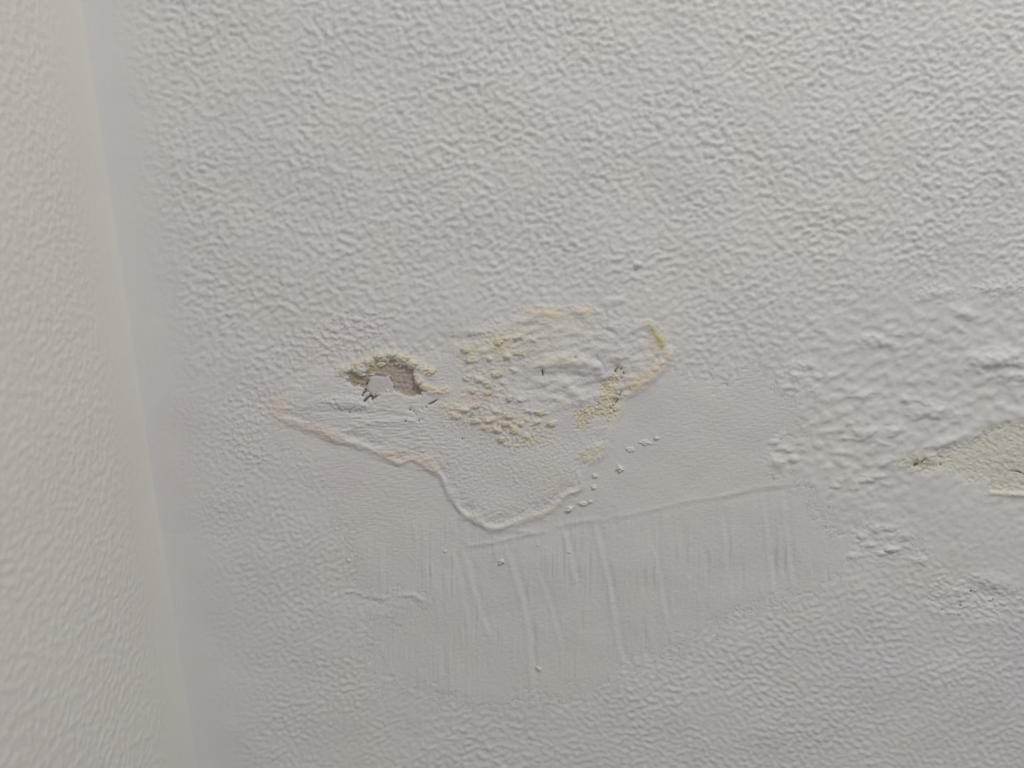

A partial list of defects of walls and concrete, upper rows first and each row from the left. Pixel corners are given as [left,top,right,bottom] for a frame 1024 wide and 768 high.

spalling [336,351,452,422]
spalling [901,417,1024,499]